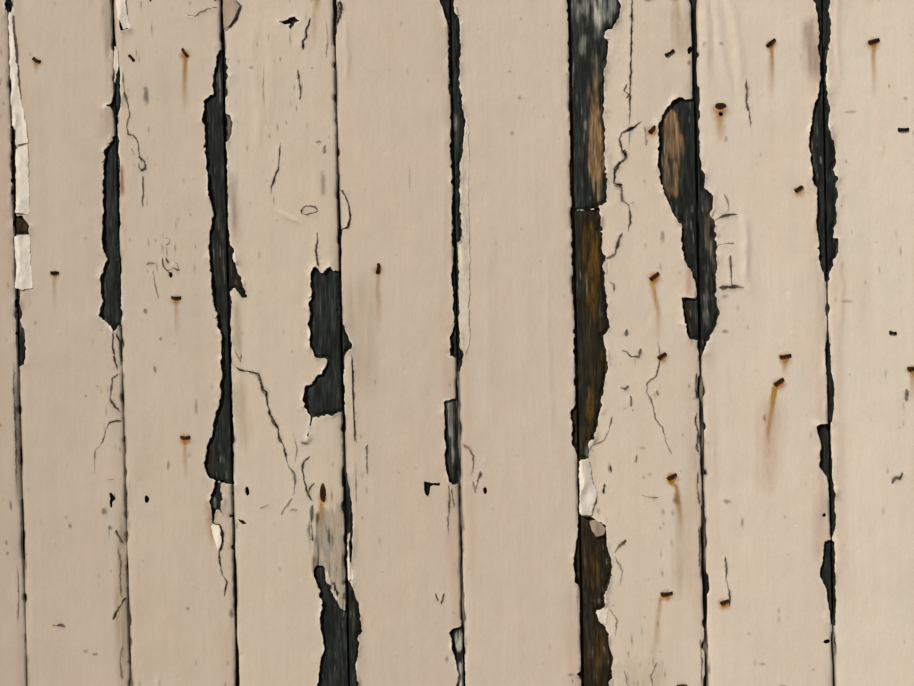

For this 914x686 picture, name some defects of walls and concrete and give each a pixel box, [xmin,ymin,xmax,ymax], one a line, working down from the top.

peeling [5,0,33,371]
peeling [99,47,123,335]
peeling [202,42,247,550]
crack [236,355,315,541]
peeling [303,267,354,440]
peeling [314,464,363,686]
peeling [440,0,471,378]
peeling [567,0,624,686]
crack [605,1,642,259]
peeling [658,94,720,354]
corrosion [768,382,783,432]
peeling [809,0,838,282]